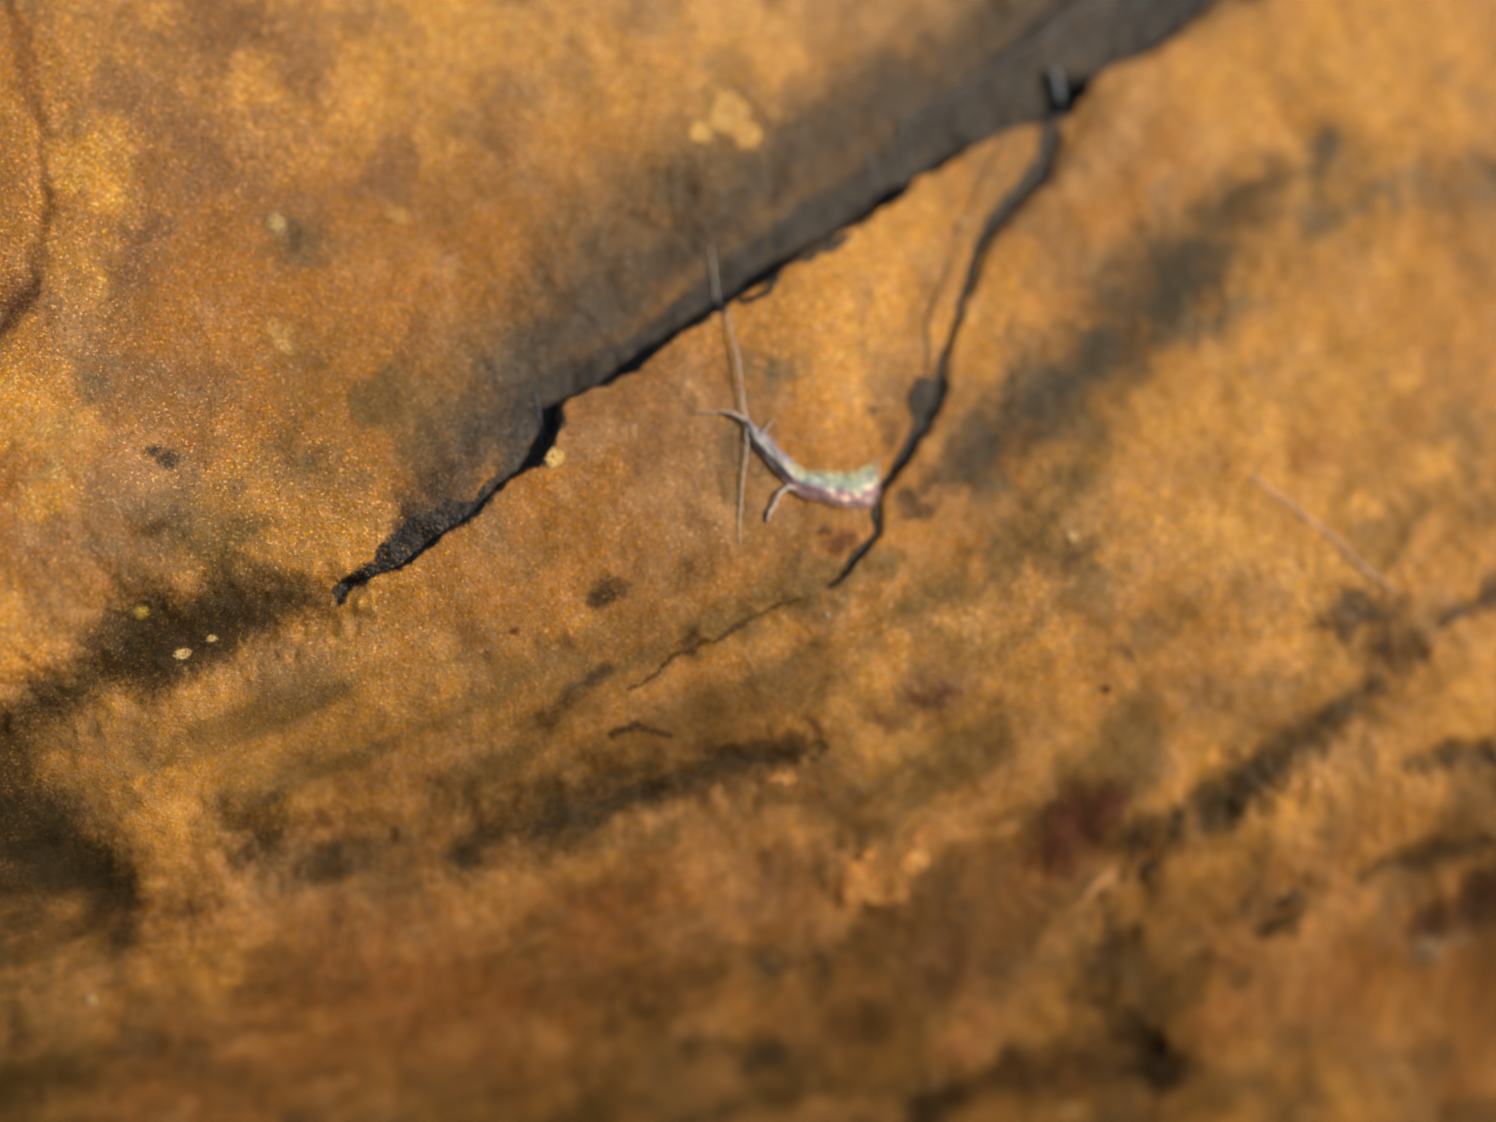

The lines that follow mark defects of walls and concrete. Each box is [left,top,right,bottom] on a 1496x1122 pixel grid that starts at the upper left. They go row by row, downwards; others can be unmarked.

crack [333,0,1219,738]
damp [0,579,331,945]
damp [218,796,362,884]